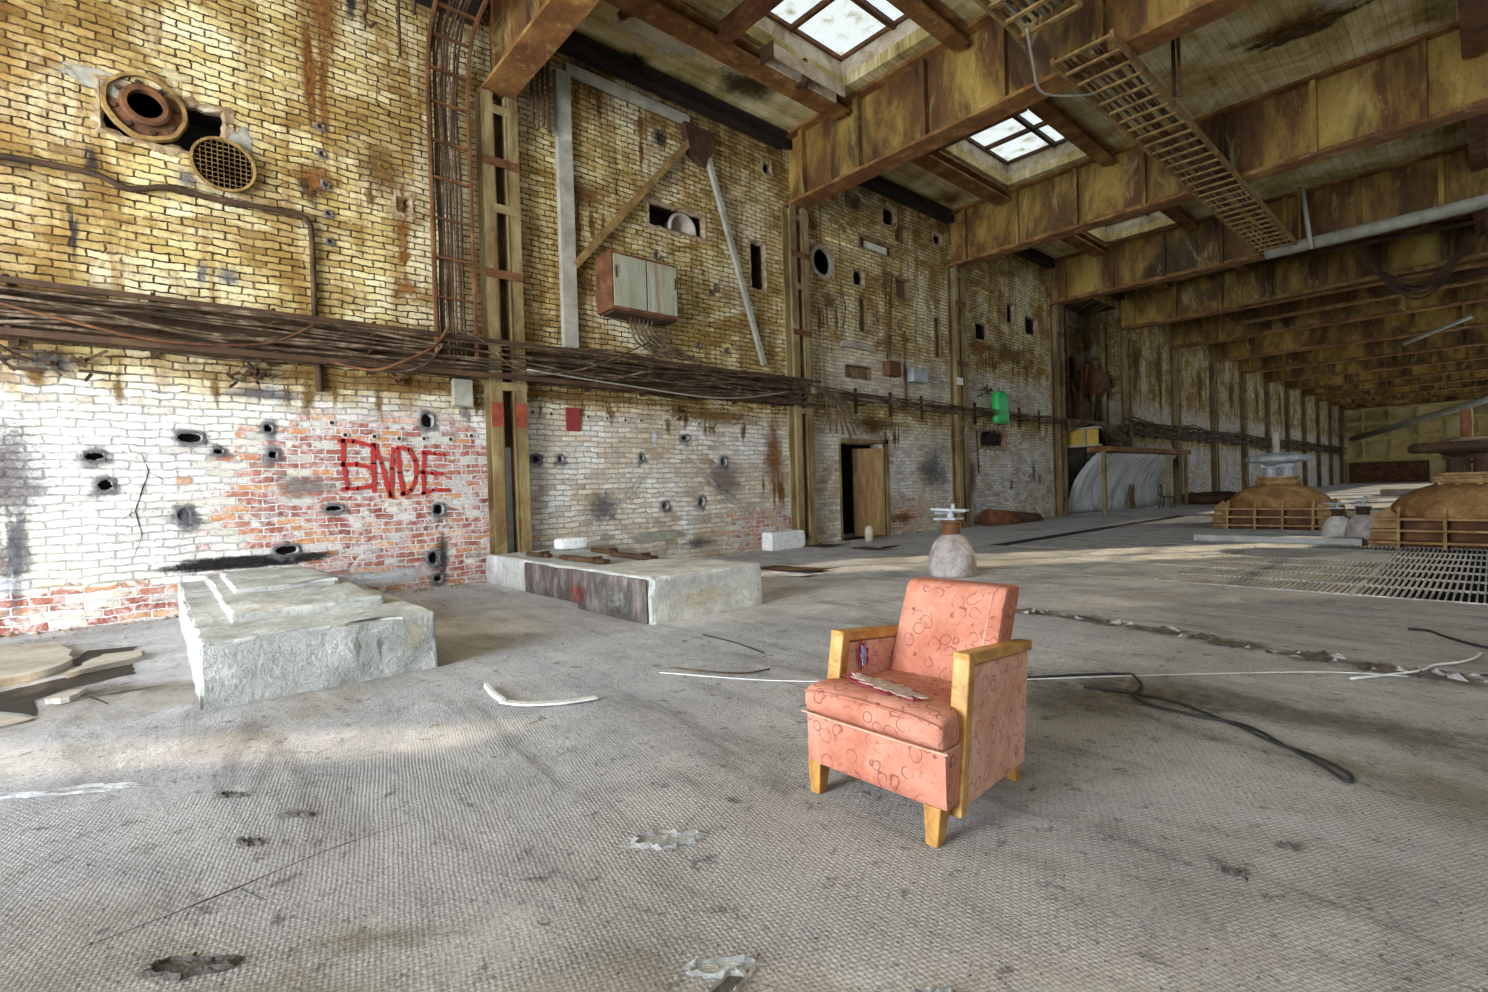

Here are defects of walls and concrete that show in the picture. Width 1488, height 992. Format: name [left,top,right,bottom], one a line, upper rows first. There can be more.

corrosion [301,0,338,130]
corrosion [298,165,334,204]
corrosion [762,429,785,507]
damp [0,431,44,599]
spalling [672,954,766,992]